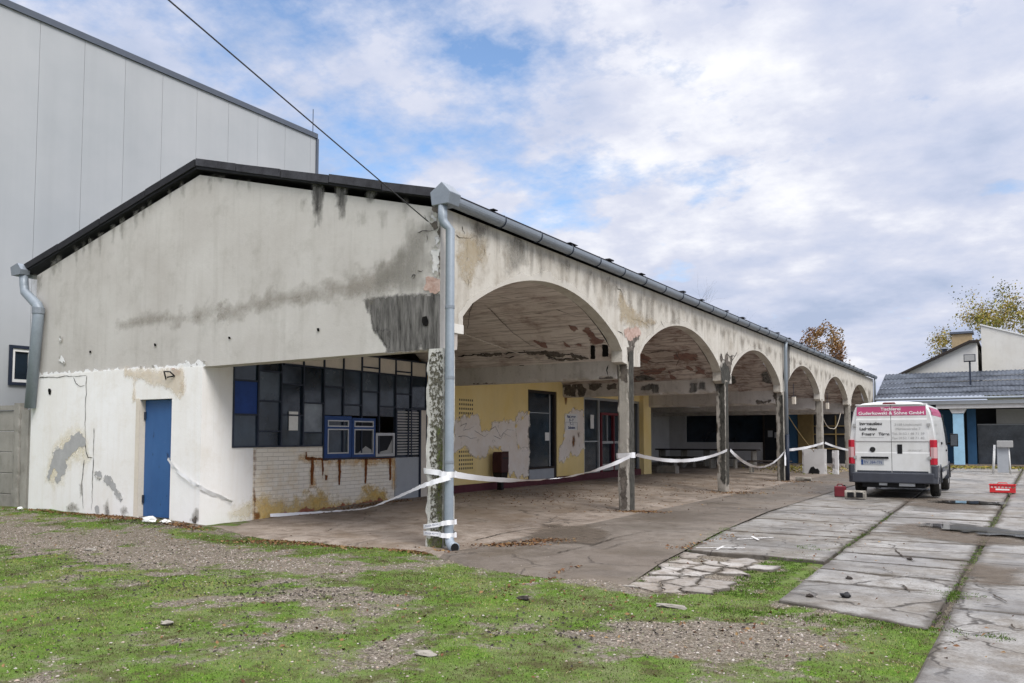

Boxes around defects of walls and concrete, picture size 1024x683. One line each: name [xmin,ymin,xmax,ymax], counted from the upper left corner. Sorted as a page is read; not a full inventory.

water stain [313,184,347,213]
flaking render [424,206,440,294]
water stain [347,235,440,353]
flaking render [523,325,604,361]
peeling [559,295,706,463]
peeling [47,432,86,484]
peeling [94,471,122,502]
rust [305,452,395,485]
peeling [429,350,530,548]